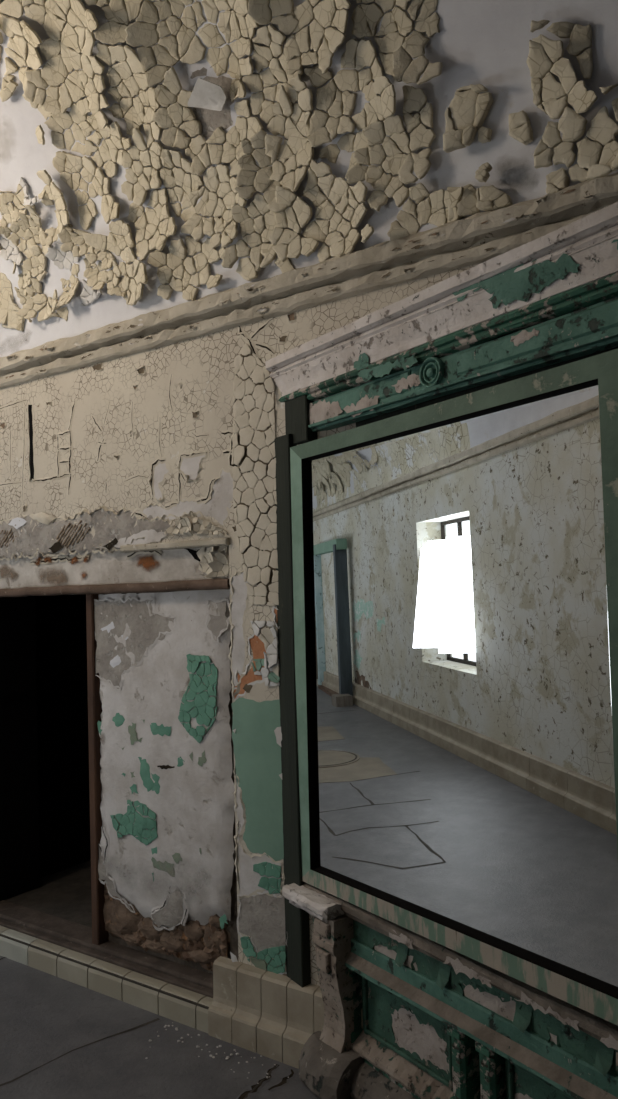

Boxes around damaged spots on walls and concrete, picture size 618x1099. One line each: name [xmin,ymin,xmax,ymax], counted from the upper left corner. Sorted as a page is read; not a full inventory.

peeling [0,0,618,337]
peeling [511,329,539,347]
peeling [309,395,379,424]
peeling [392,374,421,393]
crack [0,317,279,607]
flaking render [0,451,280,743]
peeling [274,727,282,746]
flaking render [103,767,288,974]
peeling [374,930,418,971]
peeling [444,956,579,1031]
peeling [391,1008,449,1074]
crack [236,1065,297,1099]